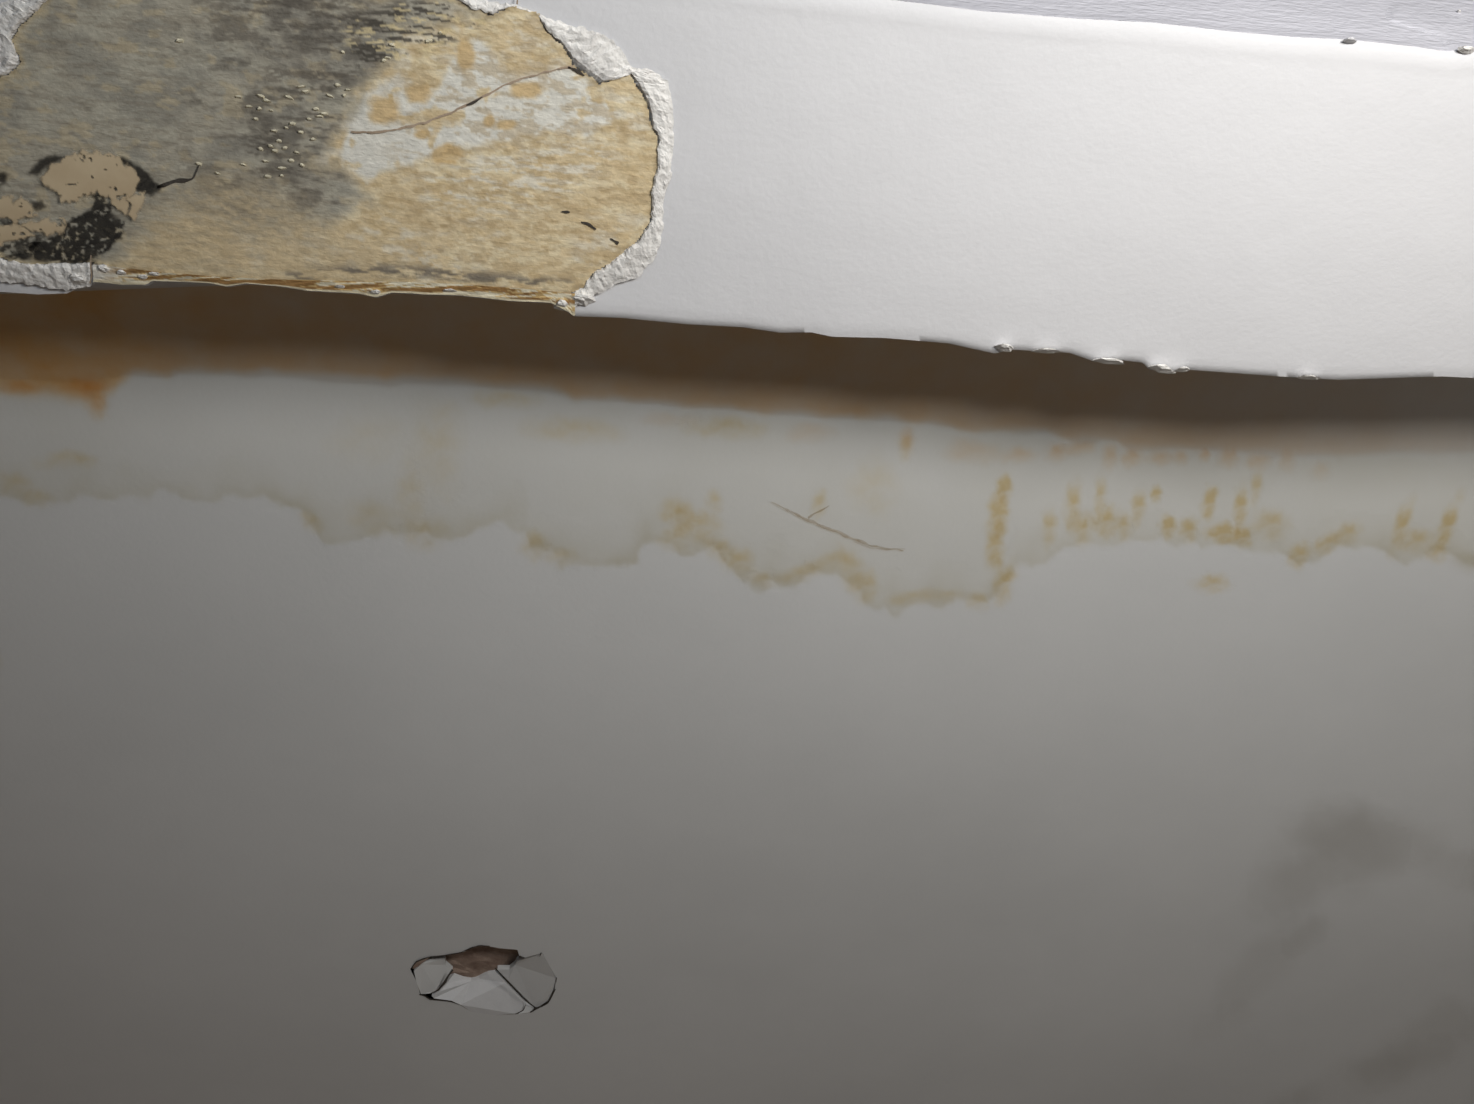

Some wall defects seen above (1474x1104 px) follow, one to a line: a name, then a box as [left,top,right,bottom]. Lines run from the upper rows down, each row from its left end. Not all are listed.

spalling [0,0,674,316]